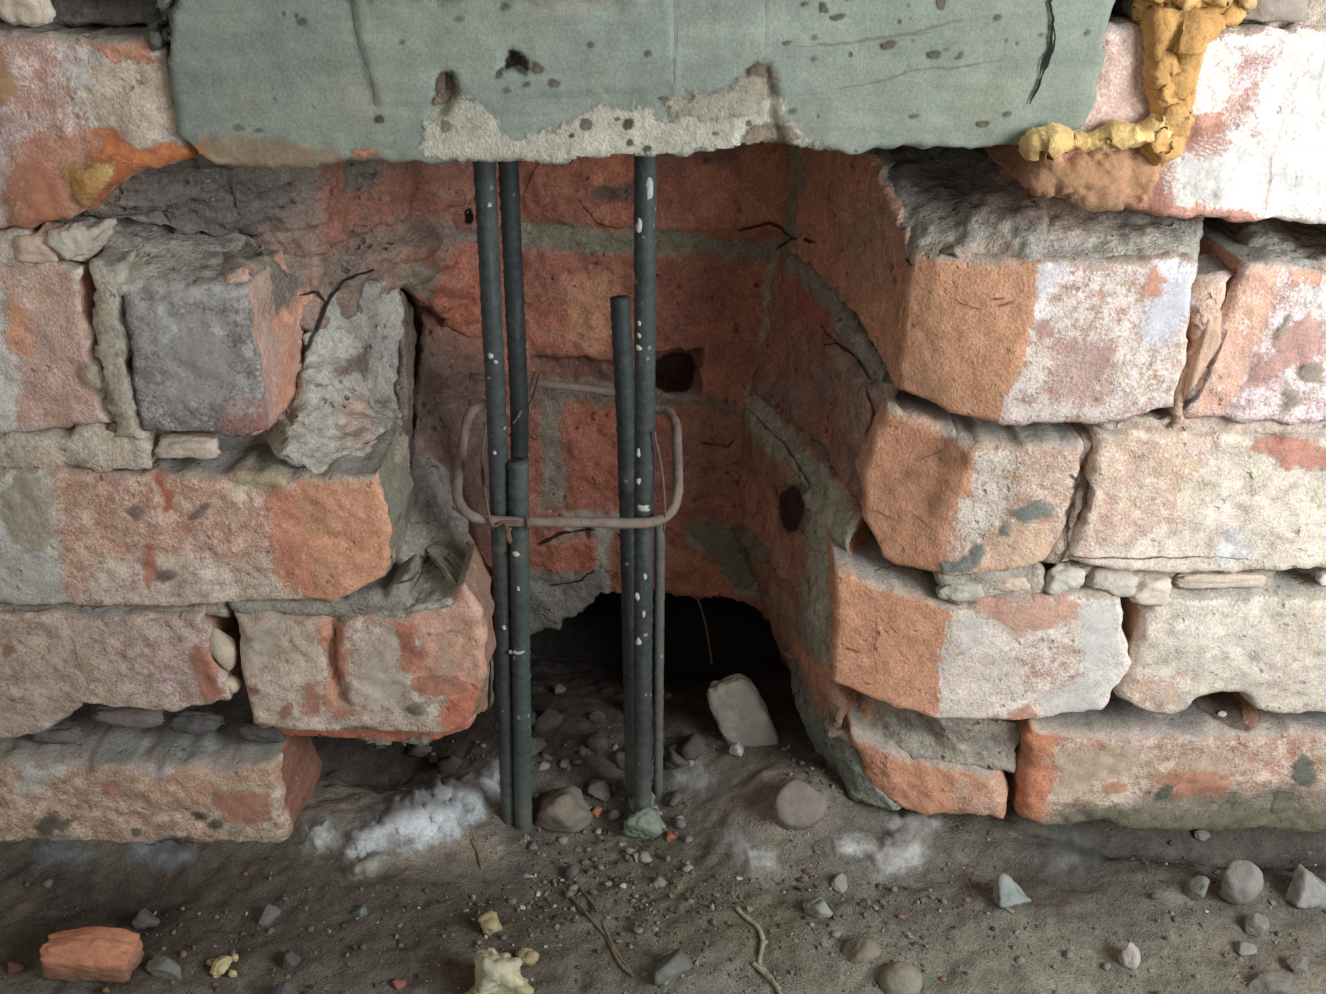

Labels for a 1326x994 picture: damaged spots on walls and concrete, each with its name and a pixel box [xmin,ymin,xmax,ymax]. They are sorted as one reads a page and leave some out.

spalling [803,0,849,21]
crack [1029,0,1056,104]
spalling [418,52,830,164]
spalling [465,209,474,224]
crack [300,268,375,364]
spalling [655,352,695,393]
spalling [778,486,804,532]
spalling [391,619,470,697]
spalling [280,683,321,719]
spalling [212,789,271,825]
damp [301,819,338,851]